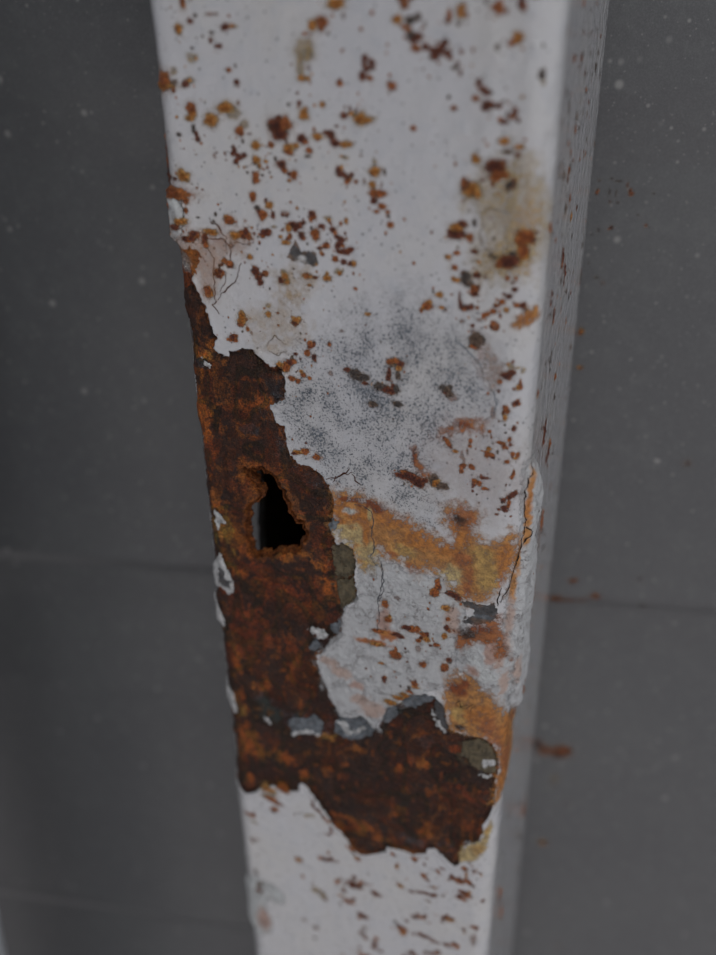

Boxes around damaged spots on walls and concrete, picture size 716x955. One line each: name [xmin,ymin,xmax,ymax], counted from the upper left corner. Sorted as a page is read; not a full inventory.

corrosion [170,0,205,67]
corrosion [201,14,235,53]
corrosion [392,0,526,124]
crack [207,218,249,314]
peeling [277,303,496,526]
corrosion [158,27,602,955]
crack [497,464,533,604]
spalling [445,591,498,625]